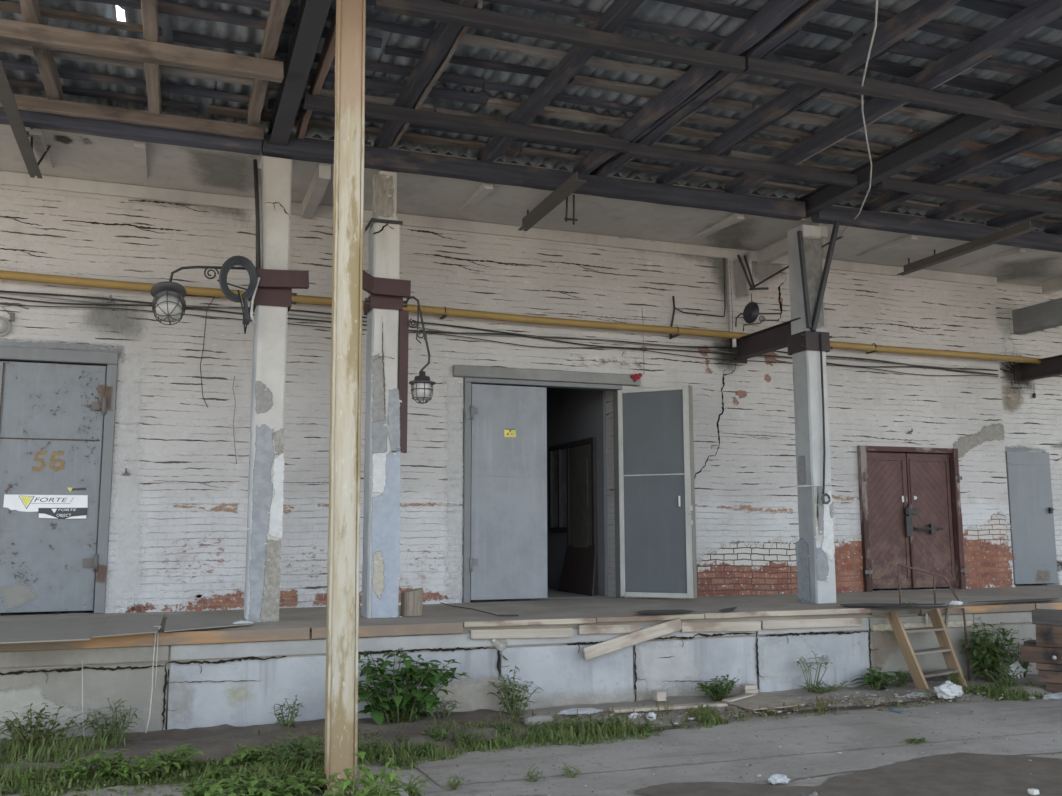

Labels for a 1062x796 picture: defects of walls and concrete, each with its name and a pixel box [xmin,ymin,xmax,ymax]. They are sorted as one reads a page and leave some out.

crack [777,280,786,322]
crack [654,358,792,478]
spalling [762,352,777,382]
peeling [123,381,328,622]
peeling [359,353,462,618]
peeling [695,454,864,602]
peeling [955,512,1016,589]